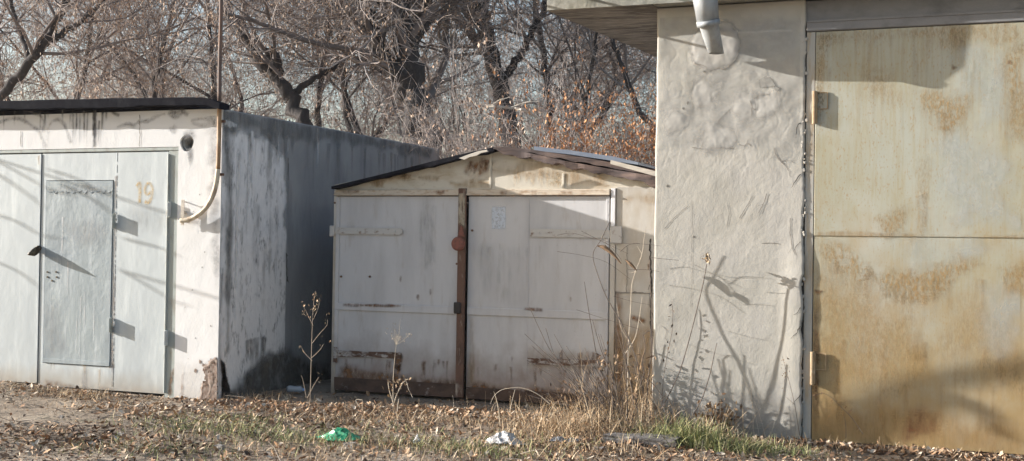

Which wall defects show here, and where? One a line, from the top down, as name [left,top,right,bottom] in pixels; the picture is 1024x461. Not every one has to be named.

damp [223,112,252,194]
peeling [194,126,287,400]
damp [225,351,331,399]
rust [342,359,454,384]